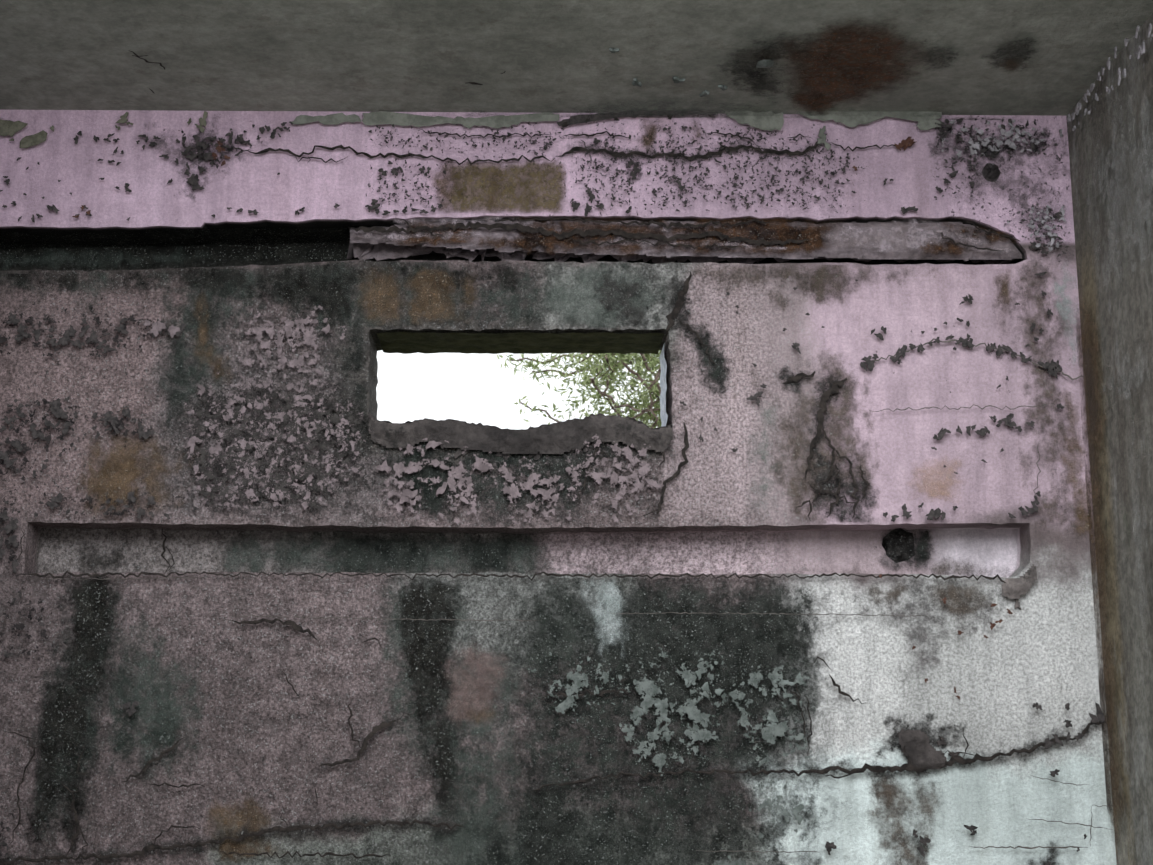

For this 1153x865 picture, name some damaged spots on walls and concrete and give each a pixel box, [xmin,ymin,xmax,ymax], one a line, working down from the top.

water stain [434,162,563,212]
crack [231,129,896,165]
corrosion [384,217,830,255]
peeling [73,23,1153,240]
corrosion [757,24,919,114]
corrosion [921,225,1014,255]
spalling [0,298,673,574]
water stain [27,543,177,853]
crack [0,698,464,865]
water stain [334,535,819,865]
peeling [545,642,818,840]
crack [531,656,1113,849]